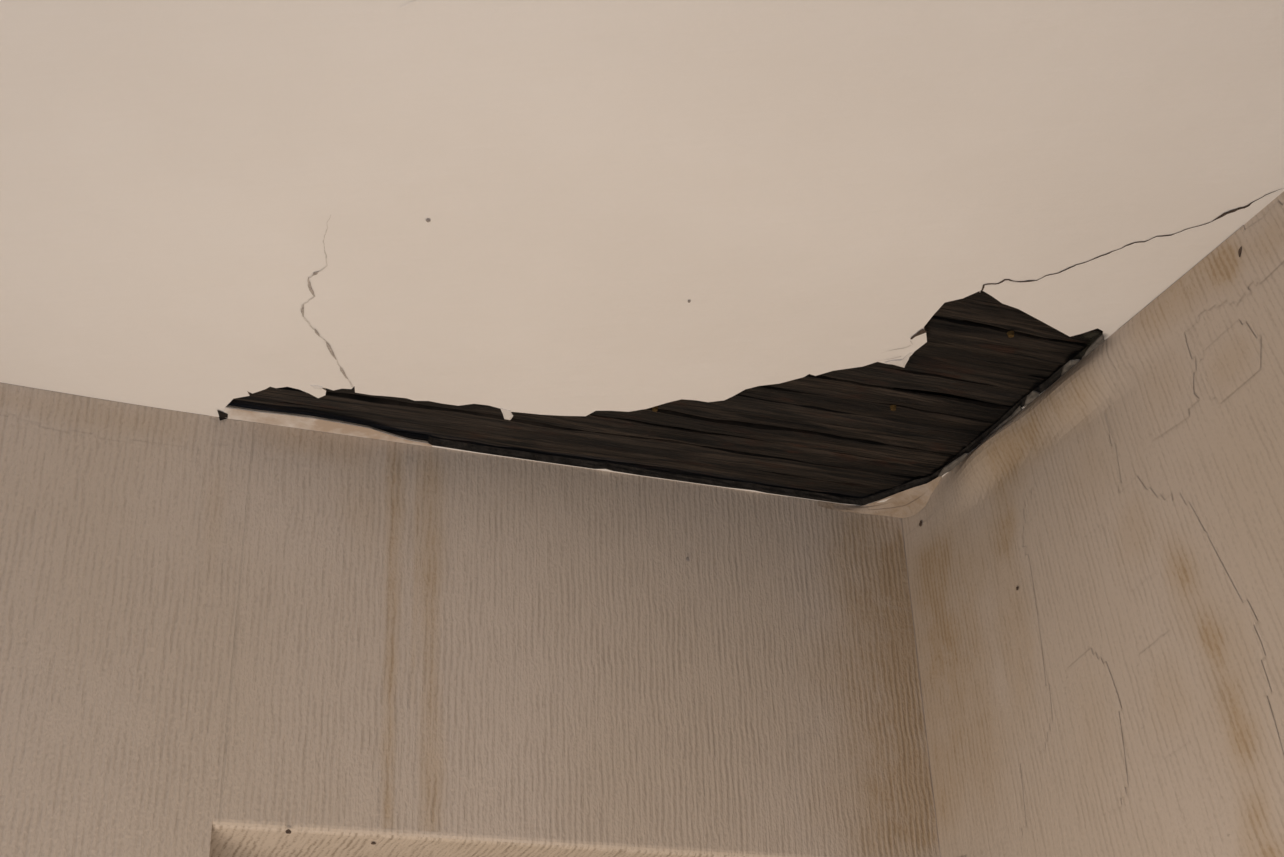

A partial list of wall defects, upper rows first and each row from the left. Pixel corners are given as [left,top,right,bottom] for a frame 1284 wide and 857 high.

crack [300,215,353,388]
peeling [885,352,914,368]
crack [980,188,1284,291]
water stain [0,383,452,832]
peeling [938,453,969,477]
water stain [787,202,1284,857]